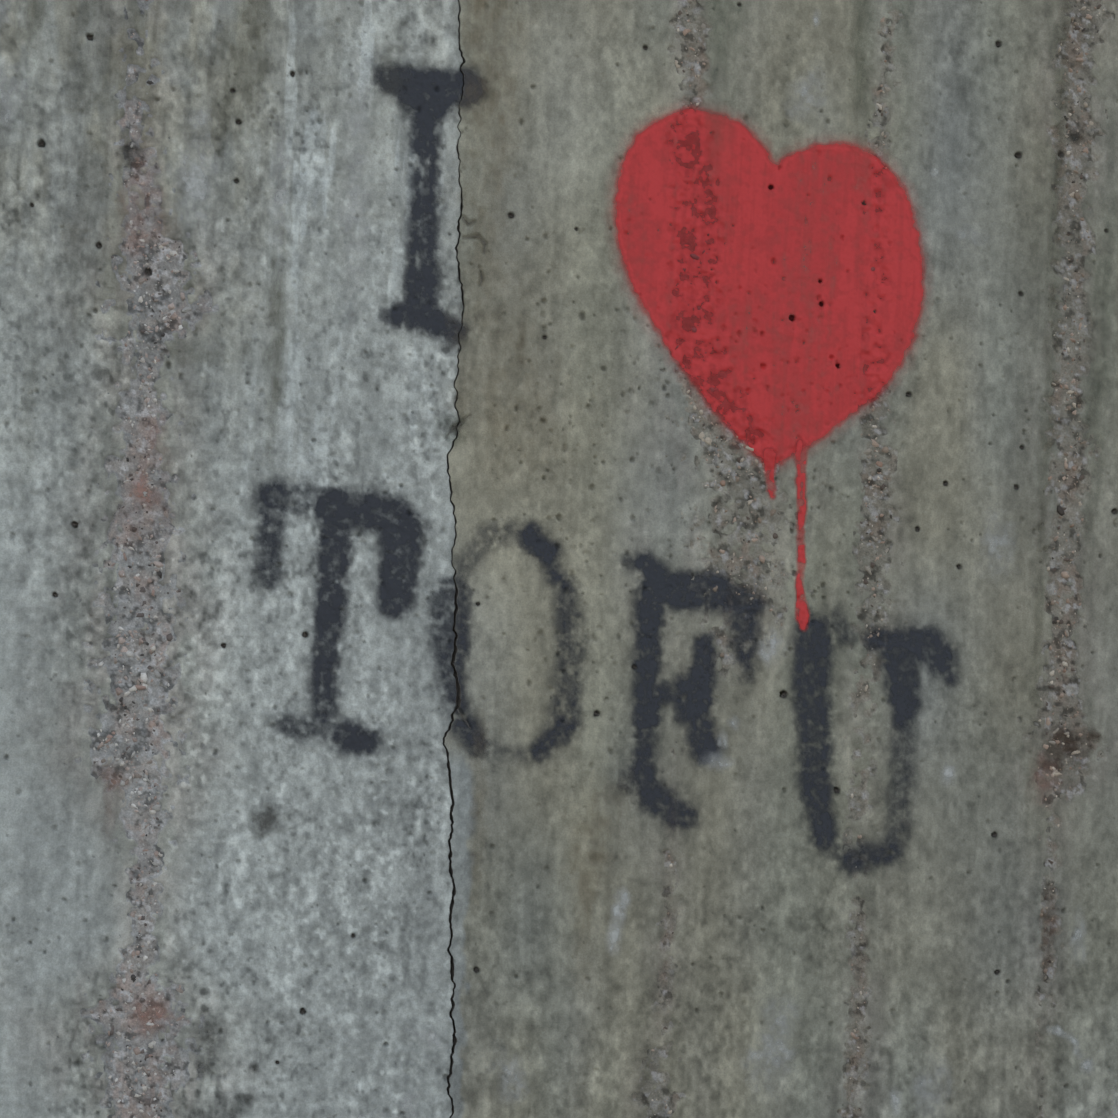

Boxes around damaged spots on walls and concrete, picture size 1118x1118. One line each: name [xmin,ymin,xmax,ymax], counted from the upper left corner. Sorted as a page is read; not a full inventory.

crack [443,0,486,1118]